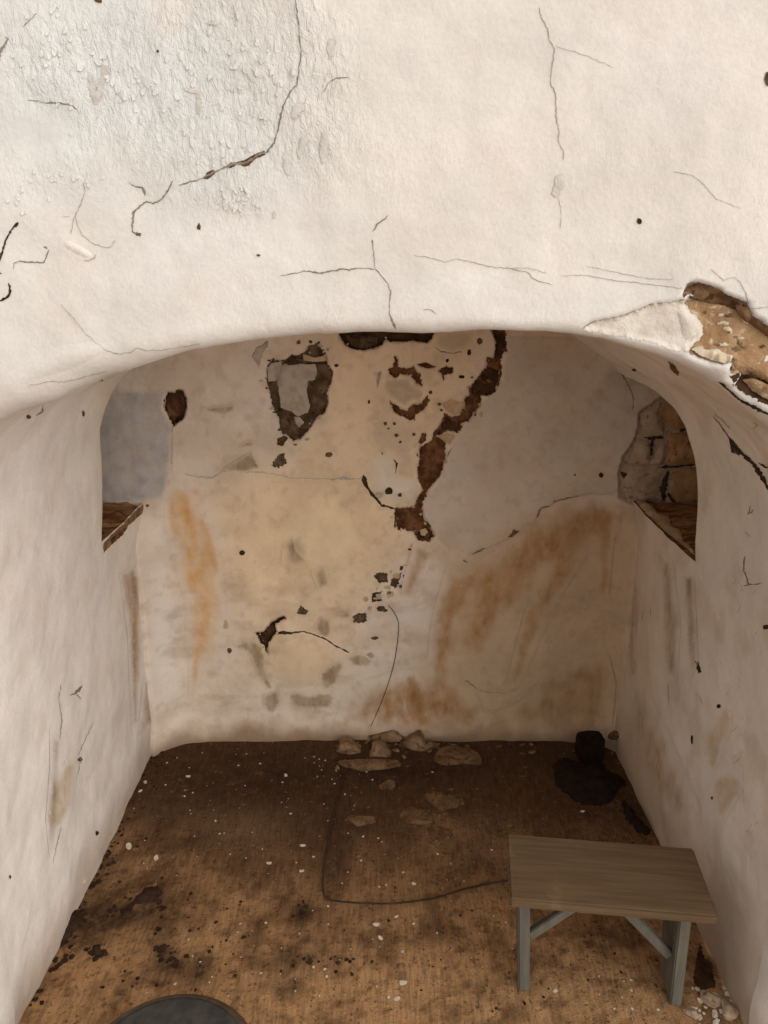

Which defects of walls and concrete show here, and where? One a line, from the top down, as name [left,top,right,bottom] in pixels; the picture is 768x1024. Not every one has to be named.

crack [65,0,302,261]
crack [539,8,613,159]
crack [0,222,49,301]
spalling [252,340,339,468]
crack [281,218,396,329]
spalling [339,330,508,550]
spalling [618,397,698,555]
spalling [582,282,768,382]
crack [714,382,768,586]
corrosion [164,484,227,698]
spalling [352,564,407,624]